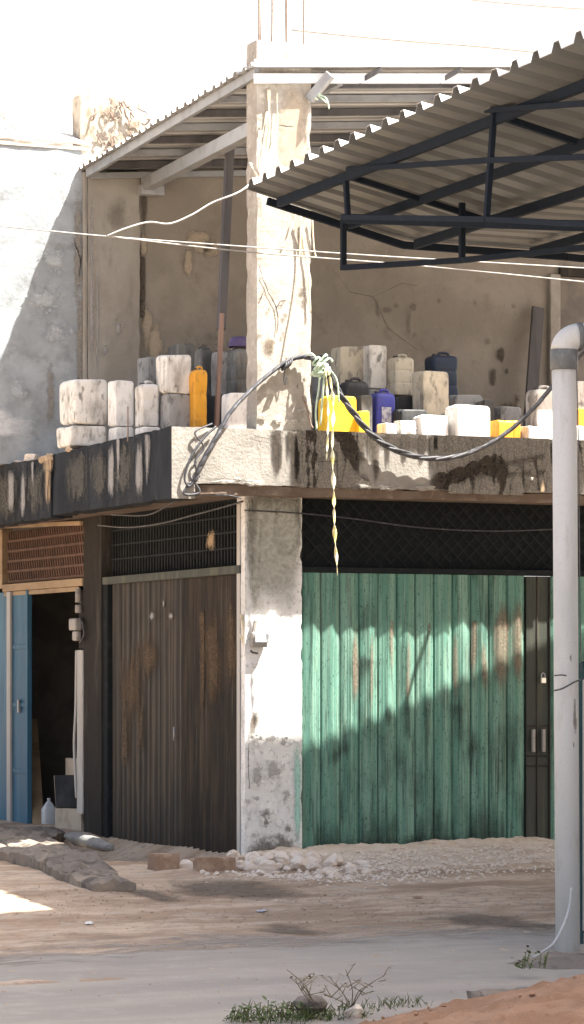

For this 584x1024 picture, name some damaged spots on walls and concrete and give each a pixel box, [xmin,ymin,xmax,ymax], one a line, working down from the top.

water stain [0,462,42,517]
water stain [66,435,150,500]
water stain [272,430,553,495]
corrosion [200,604,236,703]
corrosion [472,604,522,683]
peeling [249,735,291,747]
peeling [250,760,294,841]